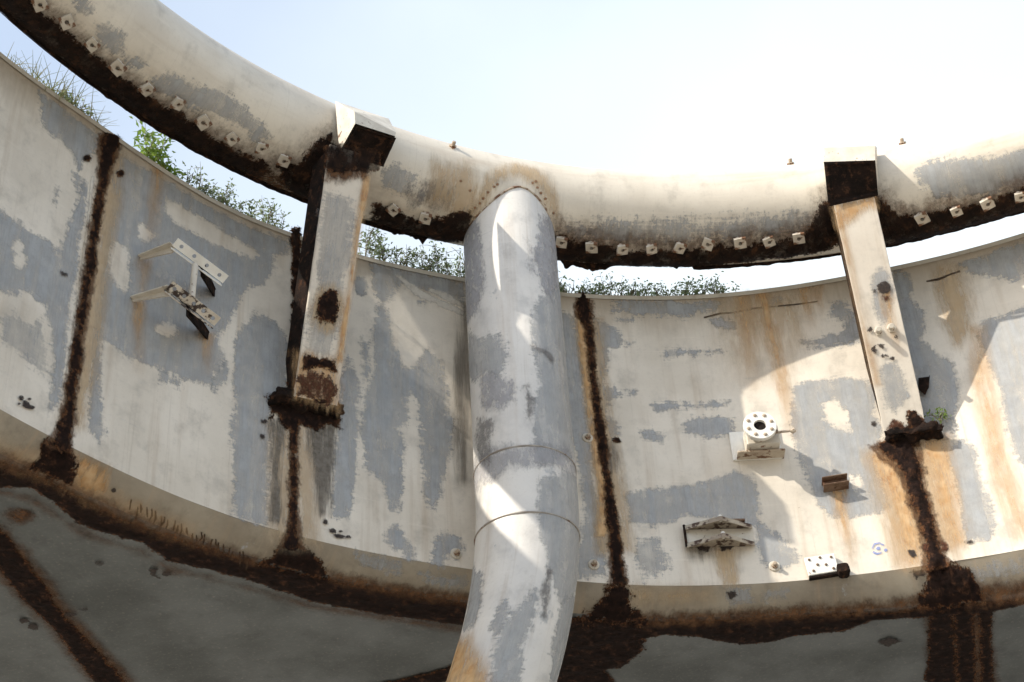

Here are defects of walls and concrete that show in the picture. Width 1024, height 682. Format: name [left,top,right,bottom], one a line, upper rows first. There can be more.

peeling [0,90,99,410]
peeling [88,156,290,525]
peeling [150,74,268,143]
corrosion [0,132,469,682]
corrosion [0,0,557,280]
peeling [323,220,514,538]
peeling [463,568,484,632]
peeling [489,209,810,682]
corrosion [555,181,1024,267]
corrosion [557,291,1024,682]
peeling [789,268,996,544]
peeling [976,308,1024,464]